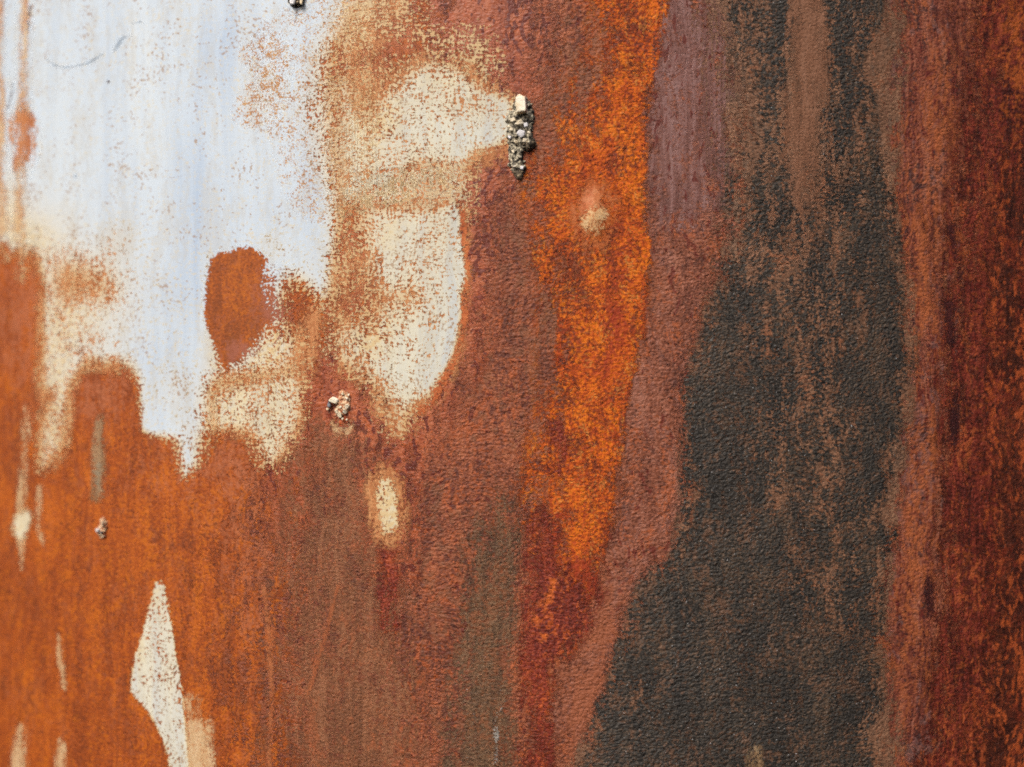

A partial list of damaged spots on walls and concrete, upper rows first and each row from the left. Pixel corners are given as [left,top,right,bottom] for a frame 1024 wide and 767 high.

peeling [129,580,190,767]
peeling [0,0,537,571]
rust [0,0,753,767]
rust [873,0,1024,767]